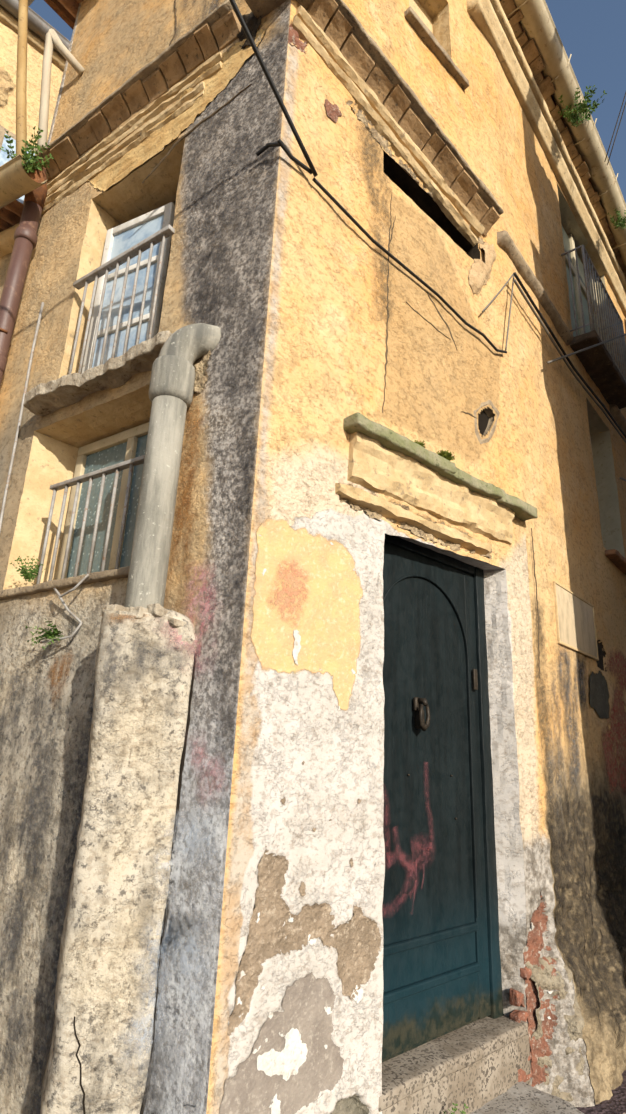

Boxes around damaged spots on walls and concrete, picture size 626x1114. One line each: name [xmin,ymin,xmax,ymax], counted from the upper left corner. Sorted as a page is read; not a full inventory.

peeling [250,519,363,710]
leakage [0,677,94,1114]
crack [74,1016,86,1114]
crack [140,653,197,1114]
peeling [219,846,381,1114]
spalling [509,892,586,1102]
leakage [533,608,626,1042]